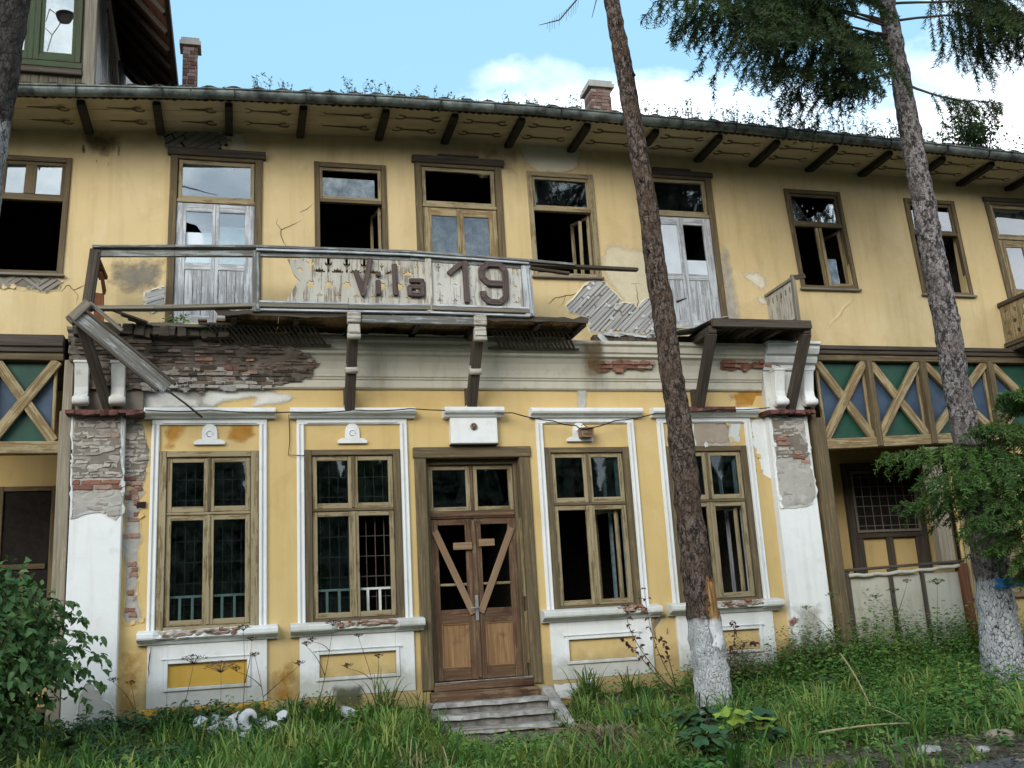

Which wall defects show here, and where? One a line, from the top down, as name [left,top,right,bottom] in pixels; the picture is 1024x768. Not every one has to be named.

damp [115,262,158,289]
peeling [743,273,767,304]
spalling [599,360,654,373]
spalling [720,360,780,372]
spalling [692,415,818,509]
spalling [69,336,322,627]